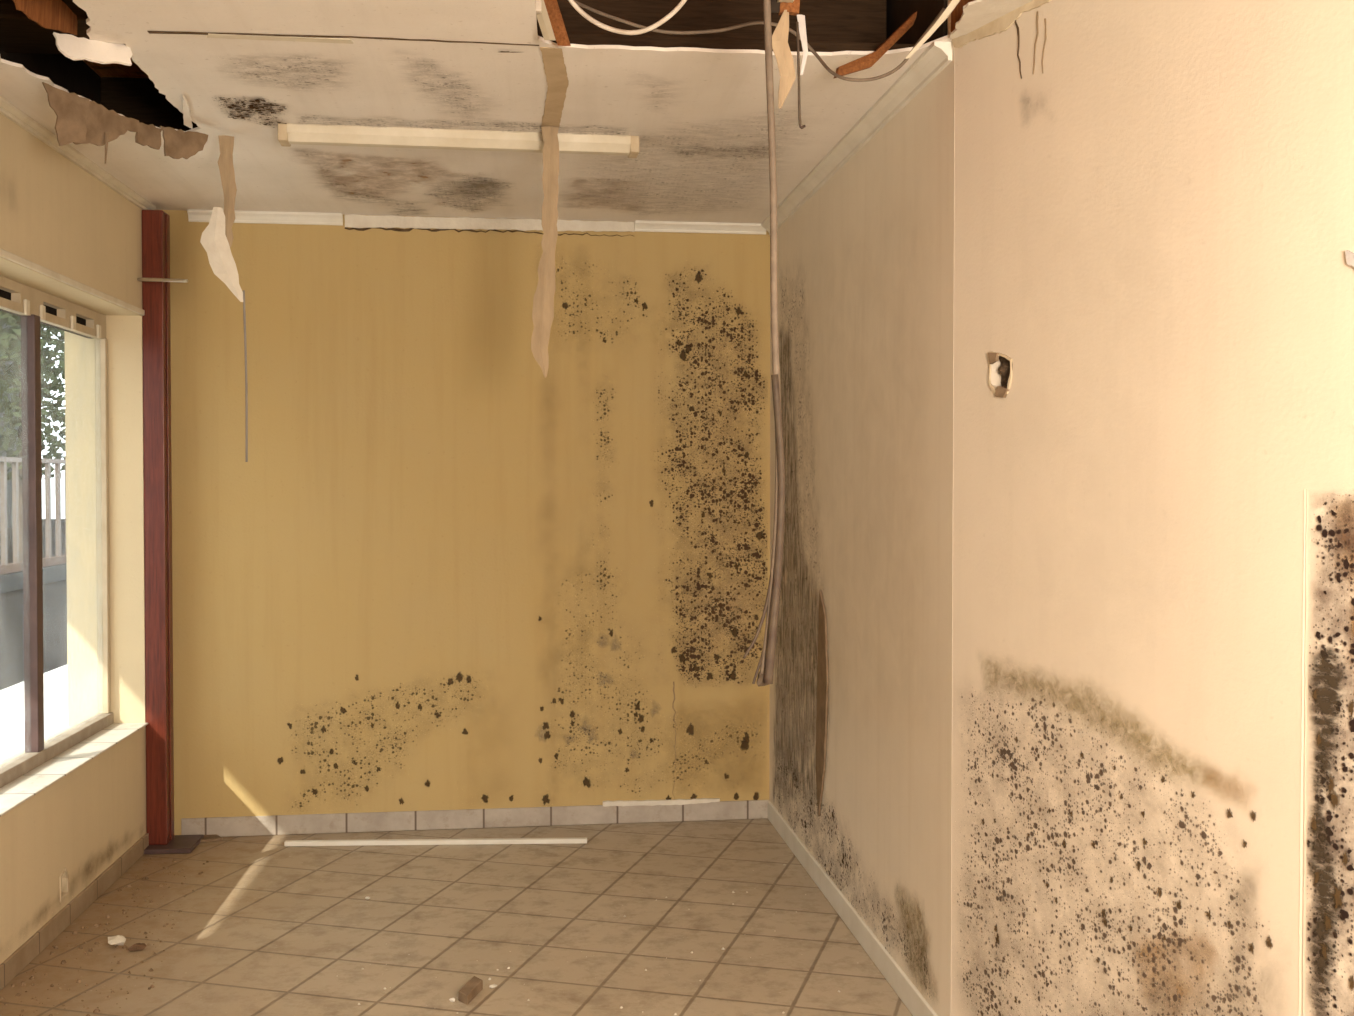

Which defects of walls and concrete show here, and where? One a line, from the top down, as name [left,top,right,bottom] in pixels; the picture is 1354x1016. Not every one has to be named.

water stain [214,97,380,128]
flaking render [948,0,1051,48]
crack [1015,11,1047,79]
water stain [539,263,930,997]
water stain [277,672,476,809]
water stain [1307,495,1354,1016]
water stain [957,670,1273,1016]